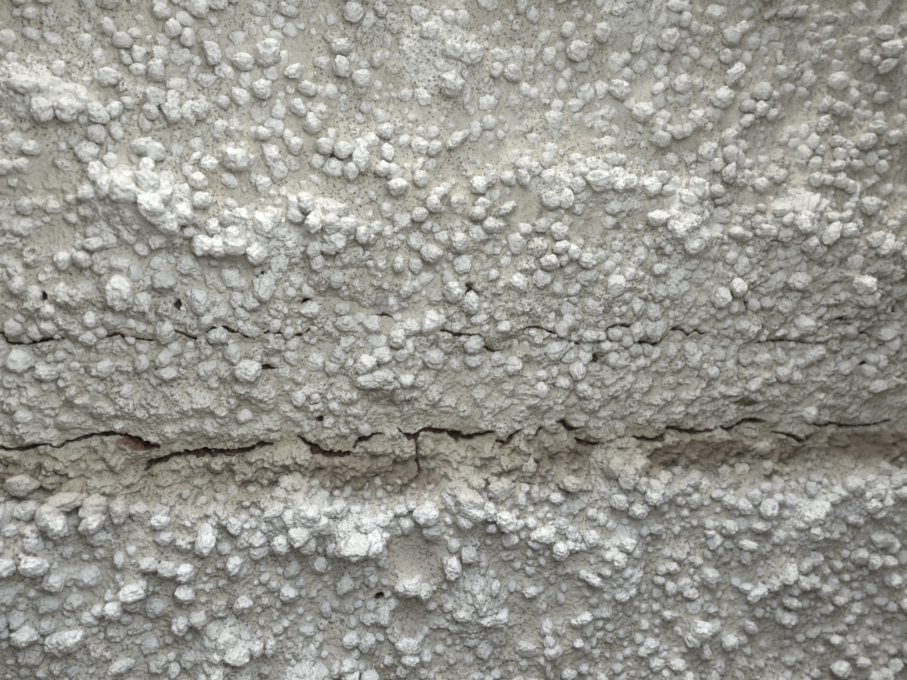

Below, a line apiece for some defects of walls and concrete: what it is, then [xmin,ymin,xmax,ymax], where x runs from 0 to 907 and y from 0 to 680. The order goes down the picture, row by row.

crack [0,431,272,470]
crack [299,419,597,473]
crack [632,418,891,443]